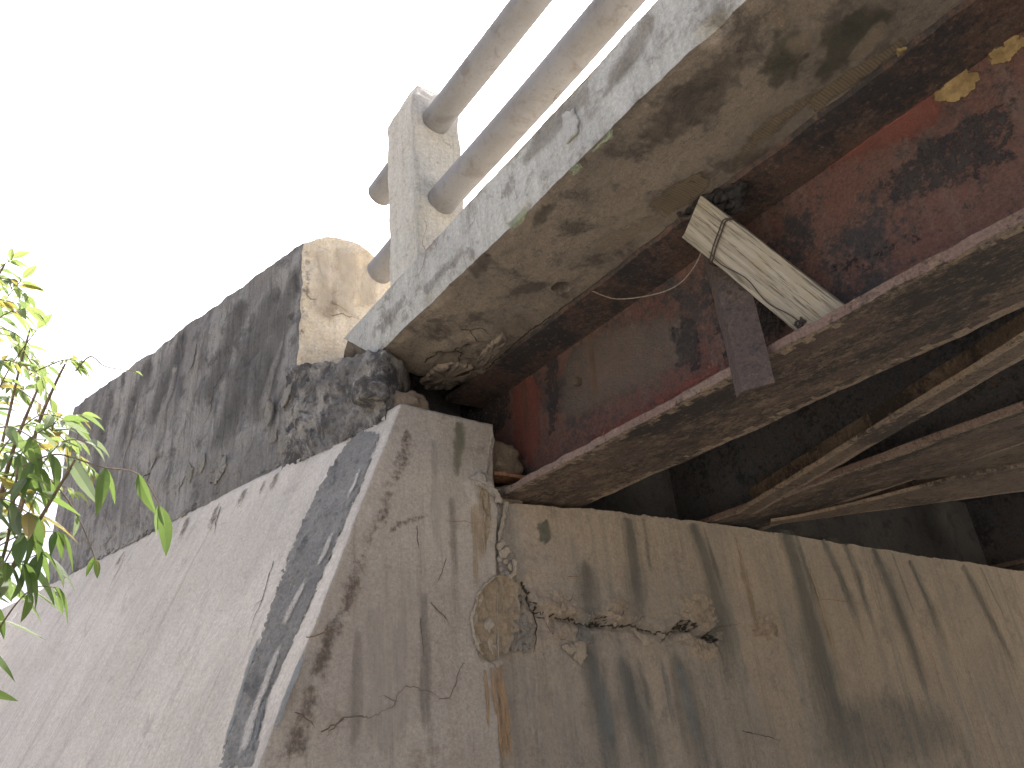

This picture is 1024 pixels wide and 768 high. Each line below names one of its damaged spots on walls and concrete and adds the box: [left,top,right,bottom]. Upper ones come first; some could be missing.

damp [610,15,652,80]
damp [527,90,587,158]
corrosion [879,97,1015,203]
crack [425,217,678,370]
corrosion [753,296,788,346]
spalling [470,500,588,668]
crack [520,576,741,662]
damp [225,640,258,742]
damp [244,703,265,757]
damp [275,657,303,727]
crack [295,662,465,737]